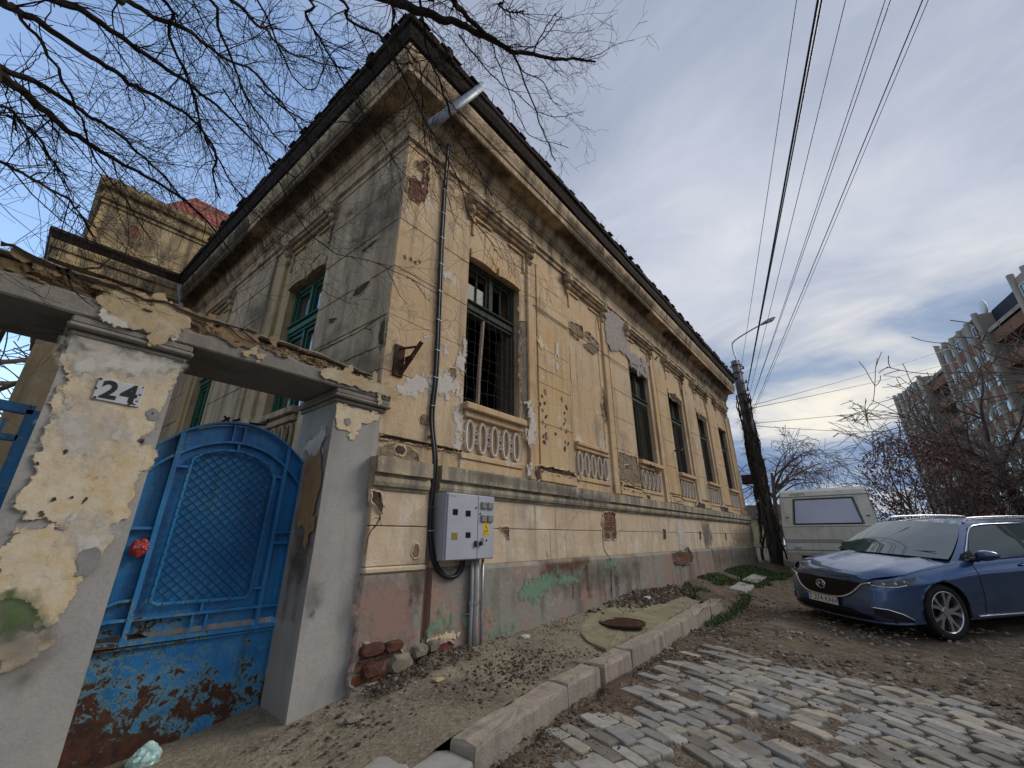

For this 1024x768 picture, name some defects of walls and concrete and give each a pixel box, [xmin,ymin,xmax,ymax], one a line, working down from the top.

spalling [405,158,430,206]
peeling [568,311,649,378]
peeling [517,305,569,452]
peeling [0,257,223,673]
peeling [241,333,467,550]
spalling [601,511,617,541]
spalling [672,546,694,566]